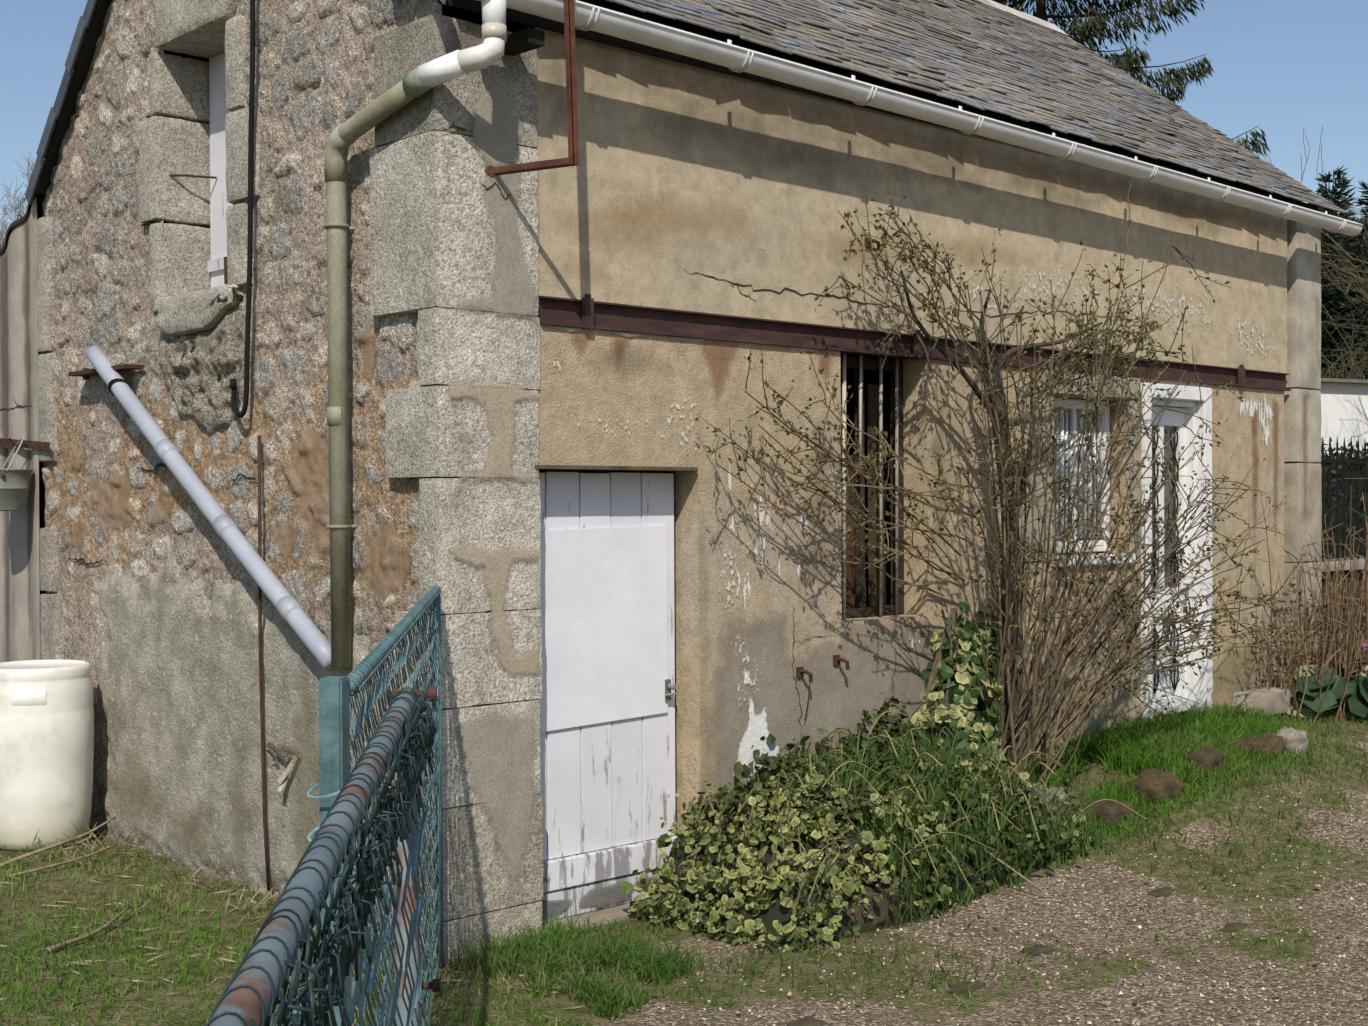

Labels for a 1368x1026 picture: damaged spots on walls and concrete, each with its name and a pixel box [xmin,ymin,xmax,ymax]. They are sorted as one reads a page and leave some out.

crack [688,272,1131,318]
crack [0,397,32,410]
peeling [727,465,808,607]
peeling [737,669,779,781]